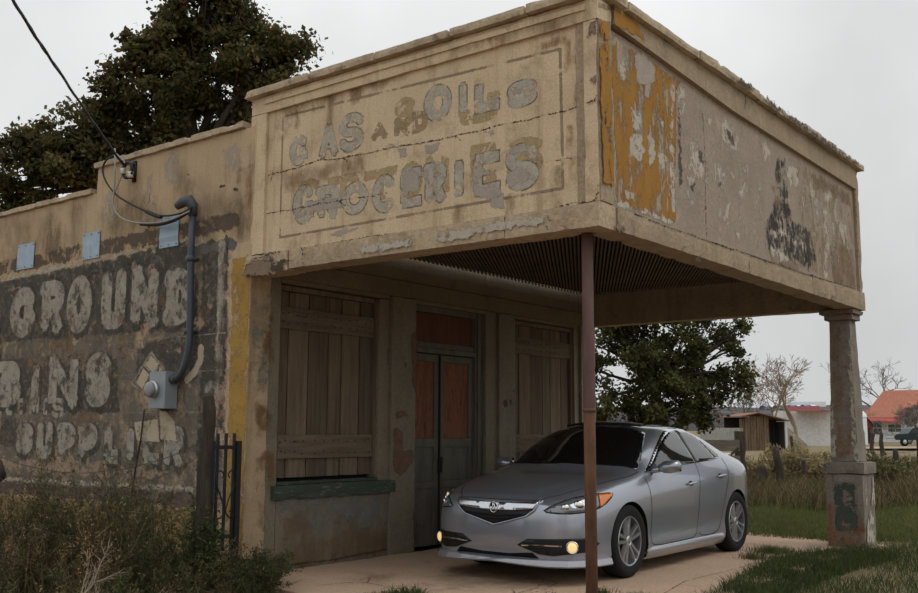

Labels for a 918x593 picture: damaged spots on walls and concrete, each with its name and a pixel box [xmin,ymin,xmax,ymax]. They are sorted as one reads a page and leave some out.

peeling [587,10,704,225]
crack [268,95,597,180]
peeling [432,216,543,243]
peeling [358,237,412,253]
spalling [244,253,285,278]